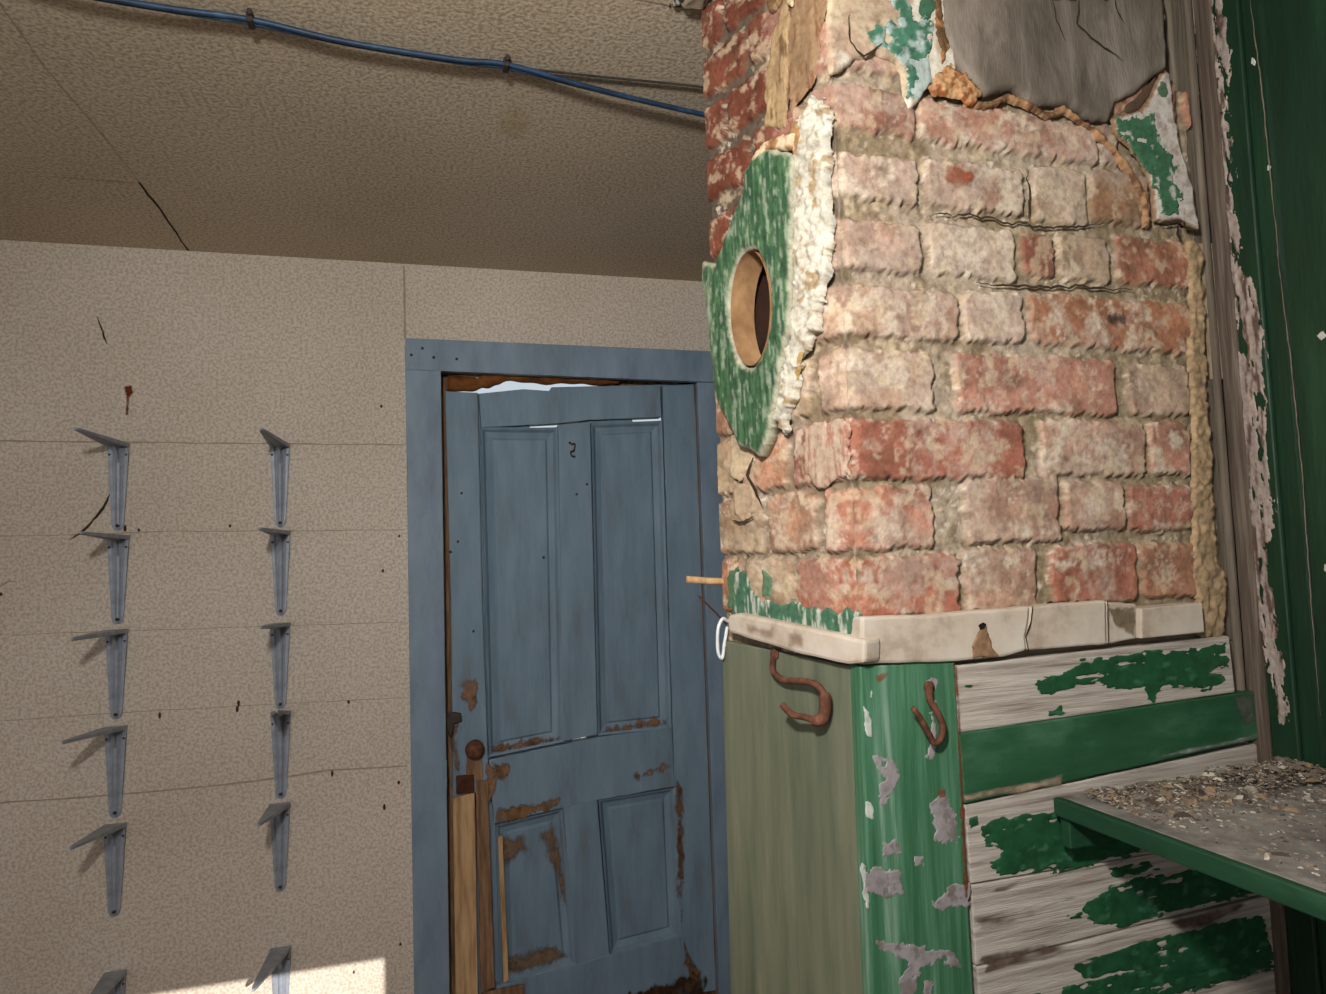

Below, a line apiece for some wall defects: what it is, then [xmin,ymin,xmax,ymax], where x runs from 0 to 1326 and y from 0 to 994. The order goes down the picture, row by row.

crack [1052,0,1125,58]
crack [0,3,190,251]
crack [930,171,1106,229]
peeling [752,0,1199,489]
crack [976,282,1132,291]
peeling [1211,0,1290,725]
crack [0,494,405,540]
peeling [1035,642,1229,716]
crack [0,765,408,804]
peeling [929,776,1254,928]
peeling [876,940,961,994]
peeling [1061,916,1275,994]